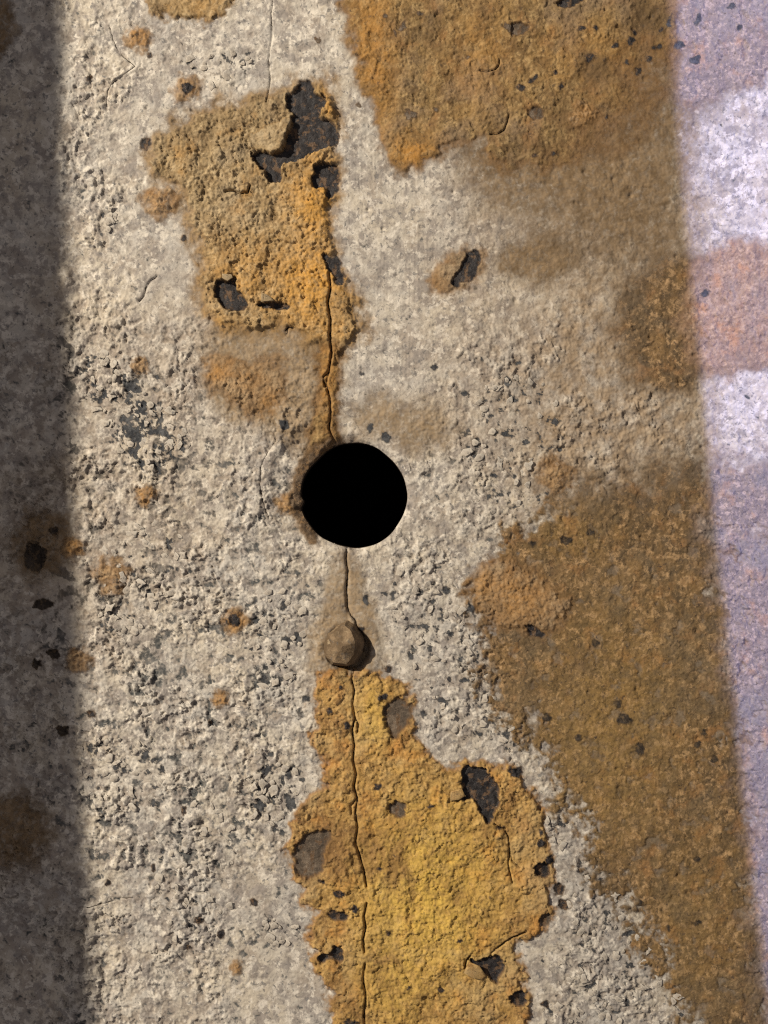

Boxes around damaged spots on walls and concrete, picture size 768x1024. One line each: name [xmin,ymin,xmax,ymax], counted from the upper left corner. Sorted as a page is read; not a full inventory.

spalling [246,80,341,199]
corrosion [336,0,768,176]
corrosion [137,81,365,455]
spalling [214,274,290,311]
crack [323,283,333,436]
spalling [451,249,481,288]
corrosion [617,240,768,391]
crack [346,549,358,628]
spalling [293,830,359,920]
crack [352,671,367,948]
spalling [450,765,504,830]
corrosion [283,455,768,1024]